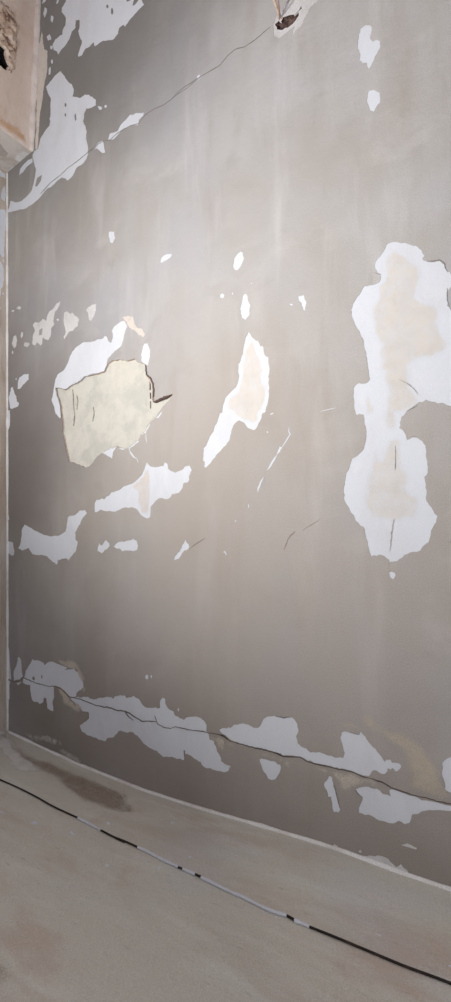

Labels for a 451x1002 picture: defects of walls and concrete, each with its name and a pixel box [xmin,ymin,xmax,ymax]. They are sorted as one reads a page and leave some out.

flaking render [273,0,316,39]
peeling [0,0,144,295]
peeling [8,374,29,429]
peeling [12,302,96,354]
flaking render [52,316,172,467]
peeling [220,292,250,320]
peeling [203,332,273,467]
peeling [233,252,244,270]
peeling [344,242,451,579]
peeling [8,463,191,564]
crack [8,678,451,805]
peeling [9,656,451,824]